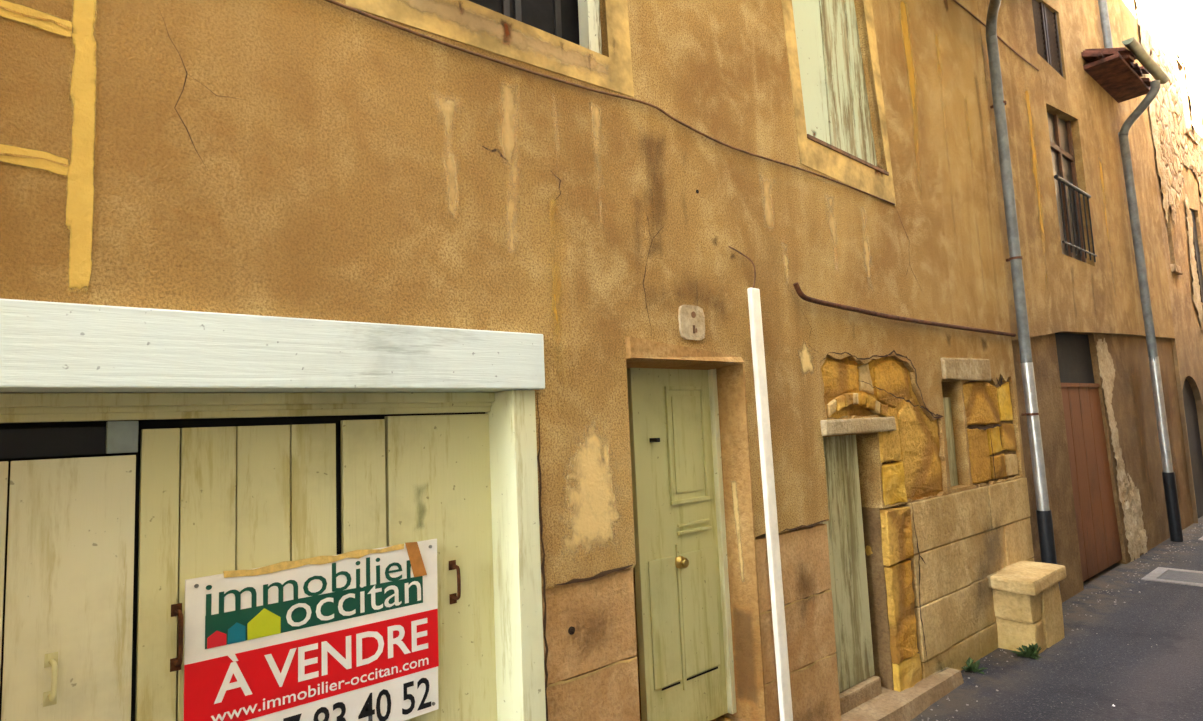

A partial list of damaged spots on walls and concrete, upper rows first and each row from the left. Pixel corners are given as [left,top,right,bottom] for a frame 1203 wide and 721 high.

crack [158,8,243,170]
flaking render [565,427,619,552]
flaking render [821,350,944,692]
flaking render [963,376,1019,485]
flaking render [1095,338,1147,562]